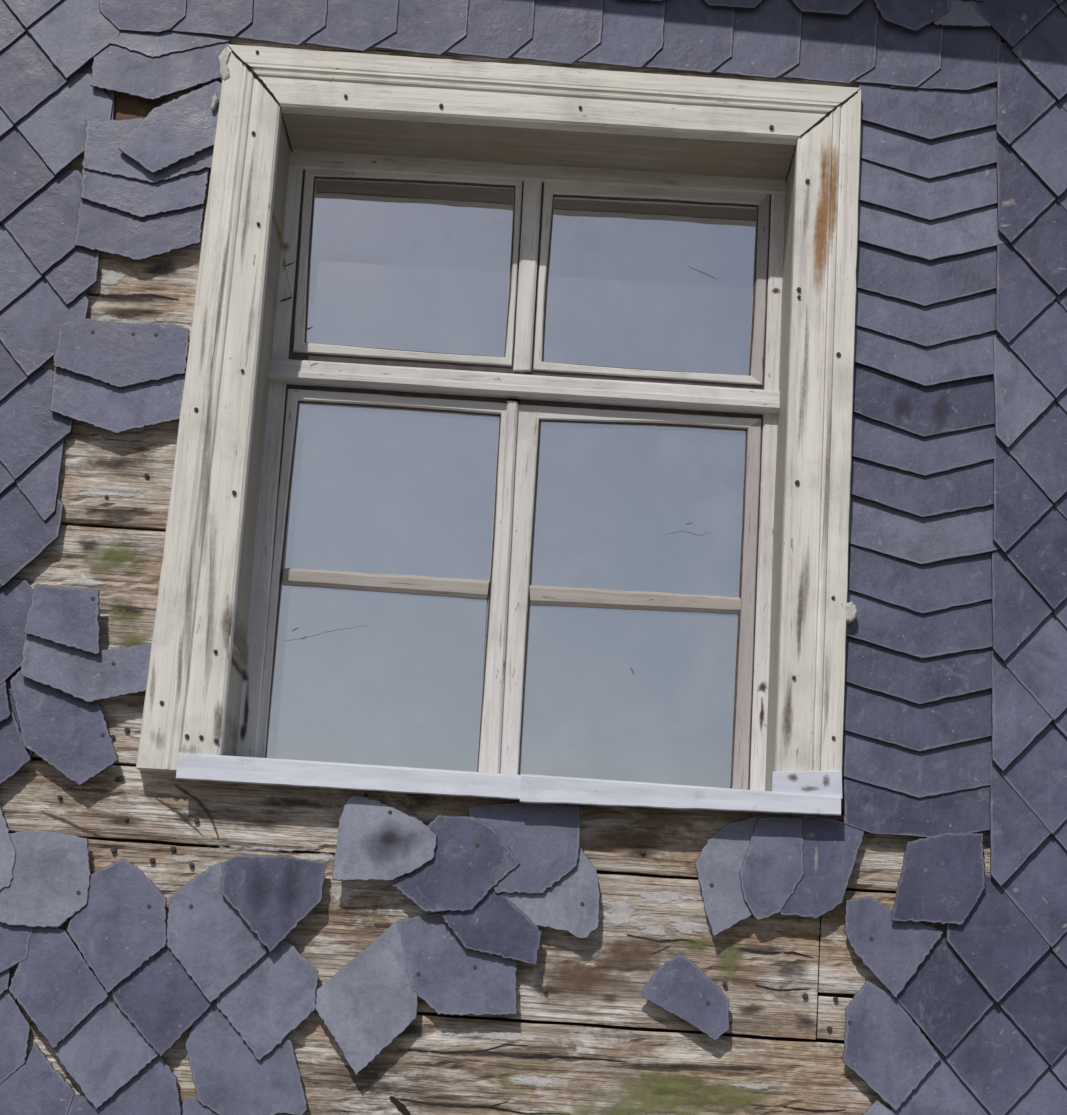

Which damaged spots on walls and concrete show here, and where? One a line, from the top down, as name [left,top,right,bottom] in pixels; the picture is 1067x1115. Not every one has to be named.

rust [815,161,836,269]
peeling [100,270,124,284]
peeling [97,315,164,324]
peeling [79,484,144,497]
peeling [70,578,104,586]
peeling [220,844,332,862]
peeling [603,891,711,935]
peeling [441,1031,545,1041]
peeling [512,1074,556,1089]